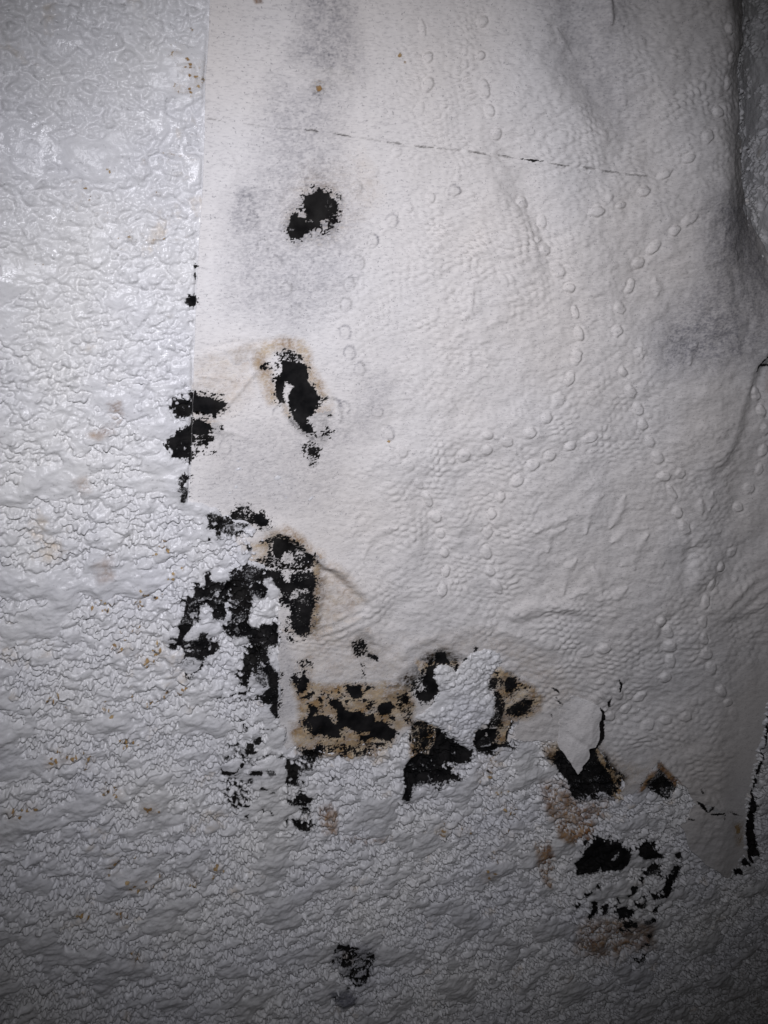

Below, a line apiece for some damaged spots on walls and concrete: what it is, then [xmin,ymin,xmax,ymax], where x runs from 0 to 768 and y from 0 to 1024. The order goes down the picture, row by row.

mould [284,184,342,243]
mould [163,390,229,503]
mould [256,342,335,466]
water stain [168,503,478,833]
mould [473,669,541,756]
water stain [537,745,683,964]
mould [331,944,375,1008]